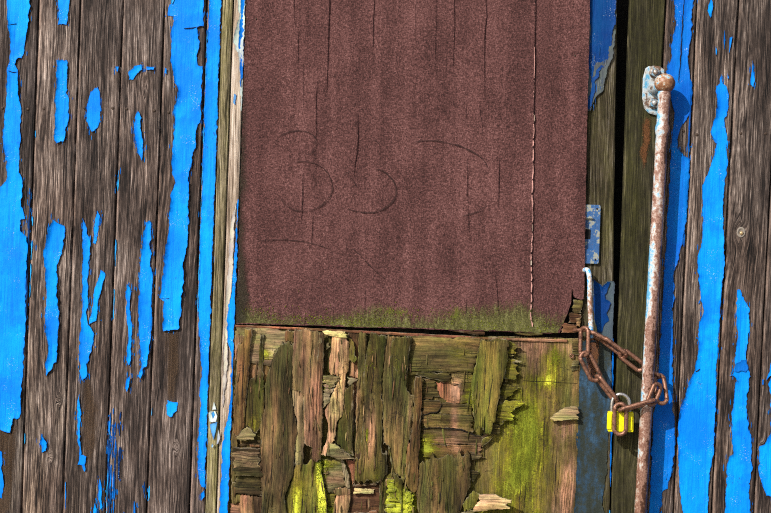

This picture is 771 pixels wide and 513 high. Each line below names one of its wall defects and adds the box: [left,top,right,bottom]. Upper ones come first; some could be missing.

peeling [0,0,65,433]
peeling [53,60,73,144]
peeling [76,211,105,382]
peeling [85,87,102,140]
peeling [124,0,239,513]
peeling [233,0,245,111]
water stain [236,136,564,333]
rust [586,338,599,378]
peeling [588,0,617,111]
rust [641,119,650,162]
peeling [649,0,730,513]
peeling [723,289,771,513]